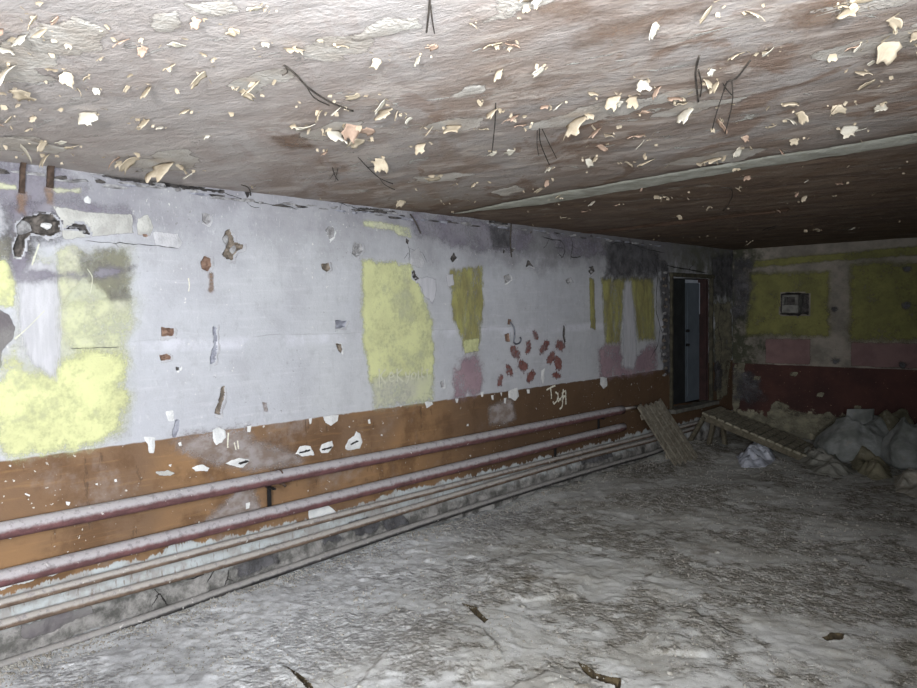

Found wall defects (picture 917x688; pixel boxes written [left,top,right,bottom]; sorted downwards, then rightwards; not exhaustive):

peeling [810,0,917,116]
peeling [0,0,661,247]
peeling [409,47,782,192]
peeling [766,102,809,129]
peeling [836,123,871,149]
rust [17,162,27,212]
rust [45,165,55,203]
spalling [9,211,95,260]
spalling [197,208,247,275]
water stain [549,232,662,279]
peeling [296,441,333,457]
peeling [345,431,362,450]